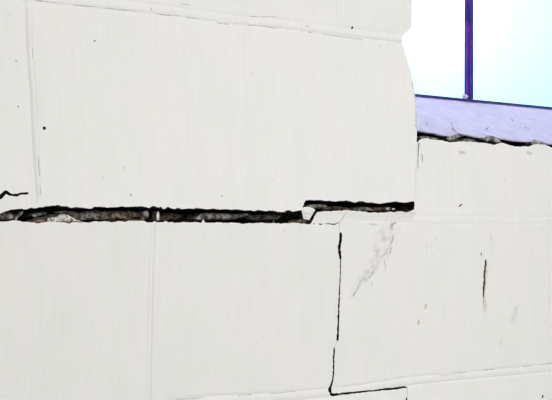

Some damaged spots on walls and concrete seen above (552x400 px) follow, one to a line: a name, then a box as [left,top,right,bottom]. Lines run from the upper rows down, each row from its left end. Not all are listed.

crack [417,122,552,163]
crack [0,189,415,400]
crack [480,253,488,301]